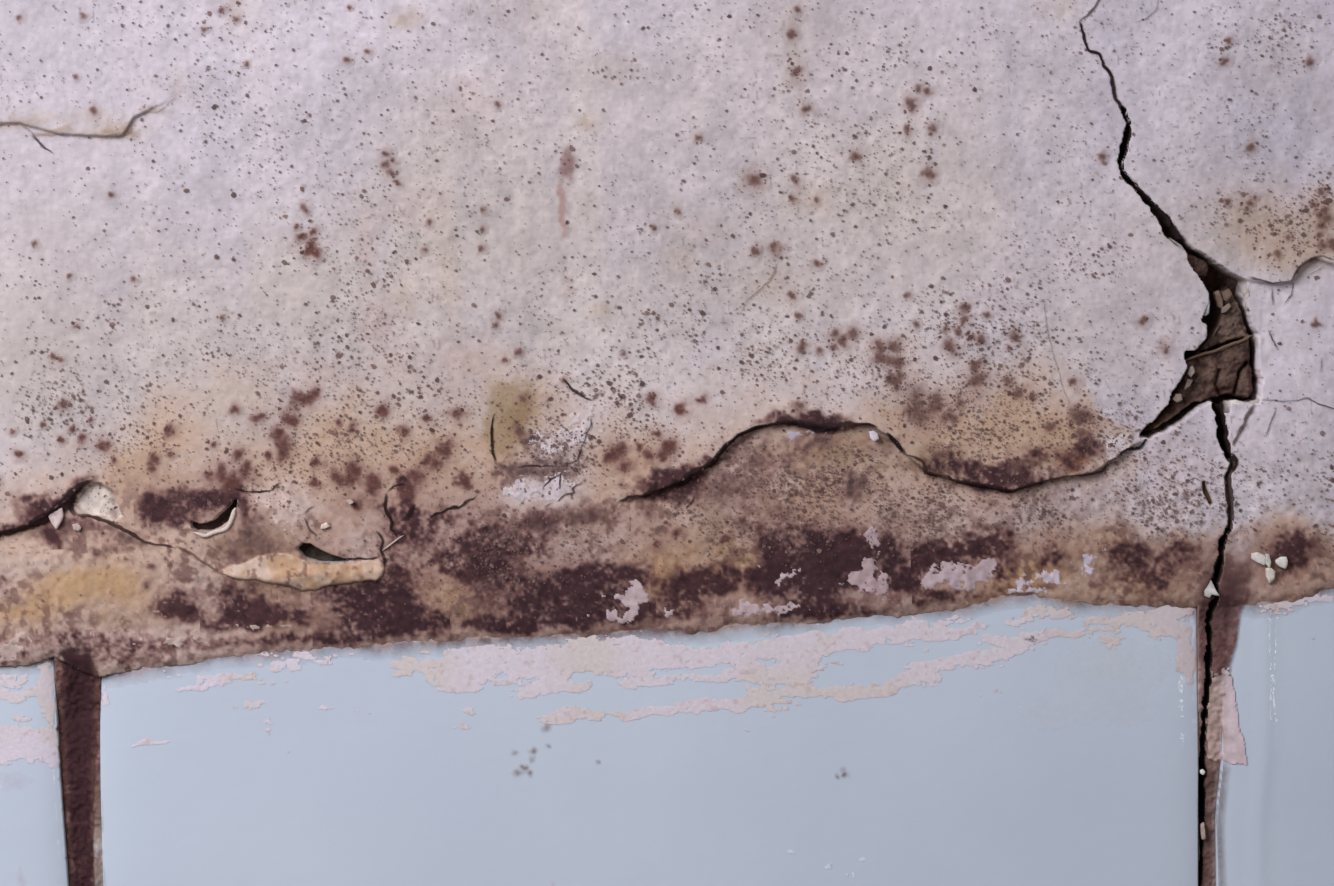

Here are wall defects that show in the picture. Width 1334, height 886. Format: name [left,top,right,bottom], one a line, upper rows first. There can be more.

damp [535,26,681,85]
damp [641,2,736,63]
crack [1079,0,1181,244]
damp [130,97,199,238]
damp [201,208,276,273]
crack [619,420,1147,505]
crack [0,480,212,568]
spalling [193,499,237,538]
flaking render [219,489,385,592]
peeling [0,631,32,667]
peeling [163,629,201,649]
crack [1198,397,1334,886]